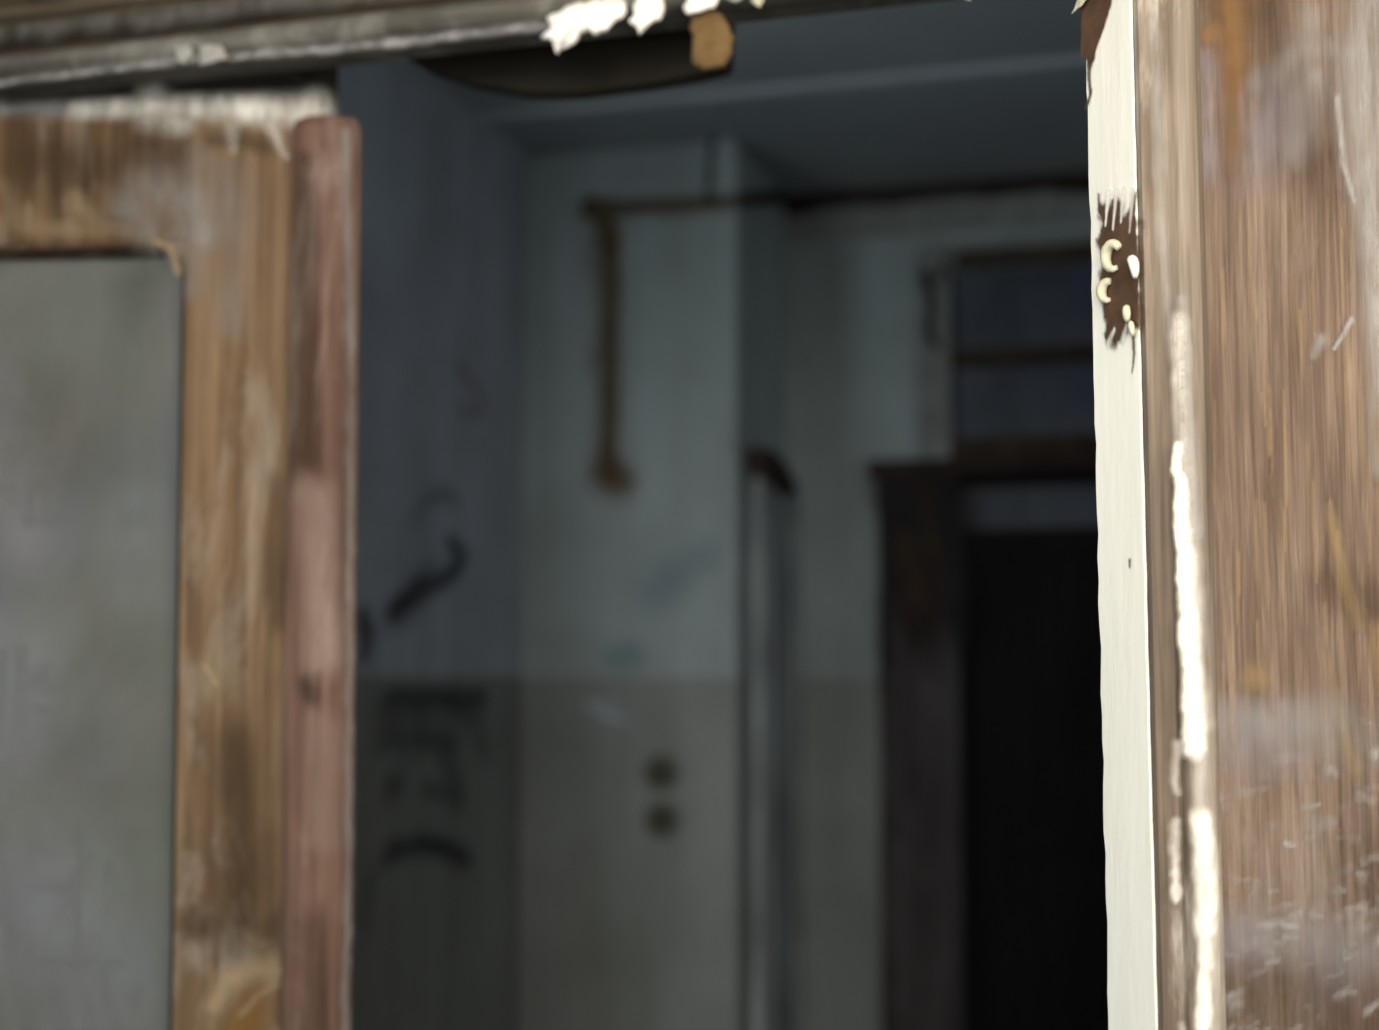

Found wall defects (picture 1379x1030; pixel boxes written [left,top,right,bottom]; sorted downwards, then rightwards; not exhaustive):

peeling [541,0,665,55]
peeling [683,0,764,15]
spalling [1096,191,1143,371]